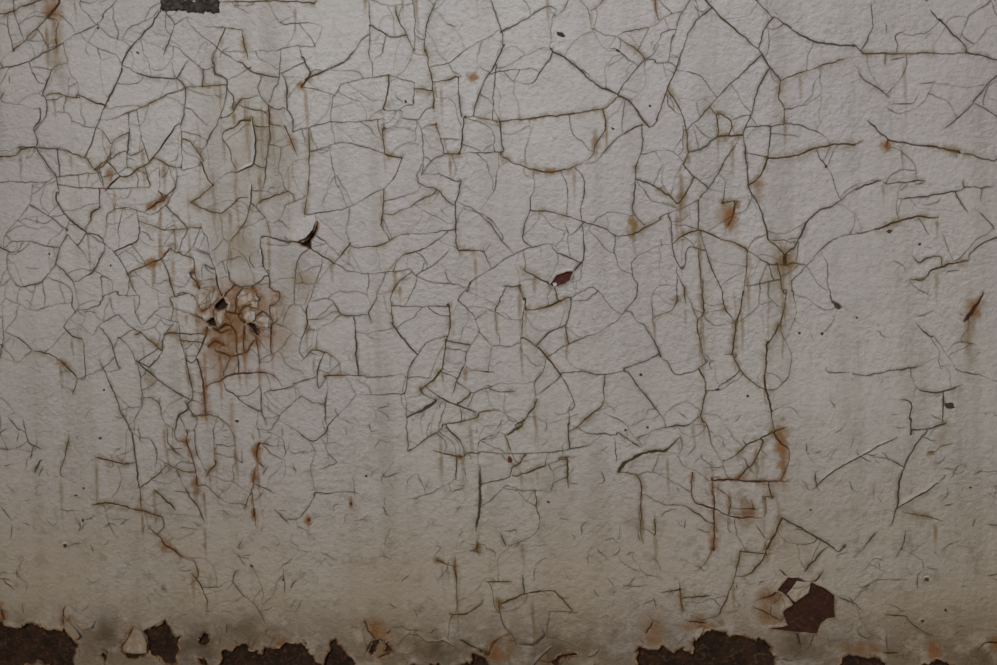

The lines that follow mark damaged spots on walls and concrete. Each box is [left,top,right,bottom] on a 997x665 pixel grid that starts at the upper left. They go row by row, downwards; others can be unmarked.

crack [868,121,997,161]
peeling [284,214,316,242]
peeling [547,269,576,291]
crack [225,292,394,428]
crack [476,399,551,528]
crack [586,432,682,539]
crack [862,371,980,554]
crack [663,517,846,620]
peeling [0,615,82,665]
peeling [123,616,185,665]
peeling [214,635,357,665]
peeling [631,575,839,665]